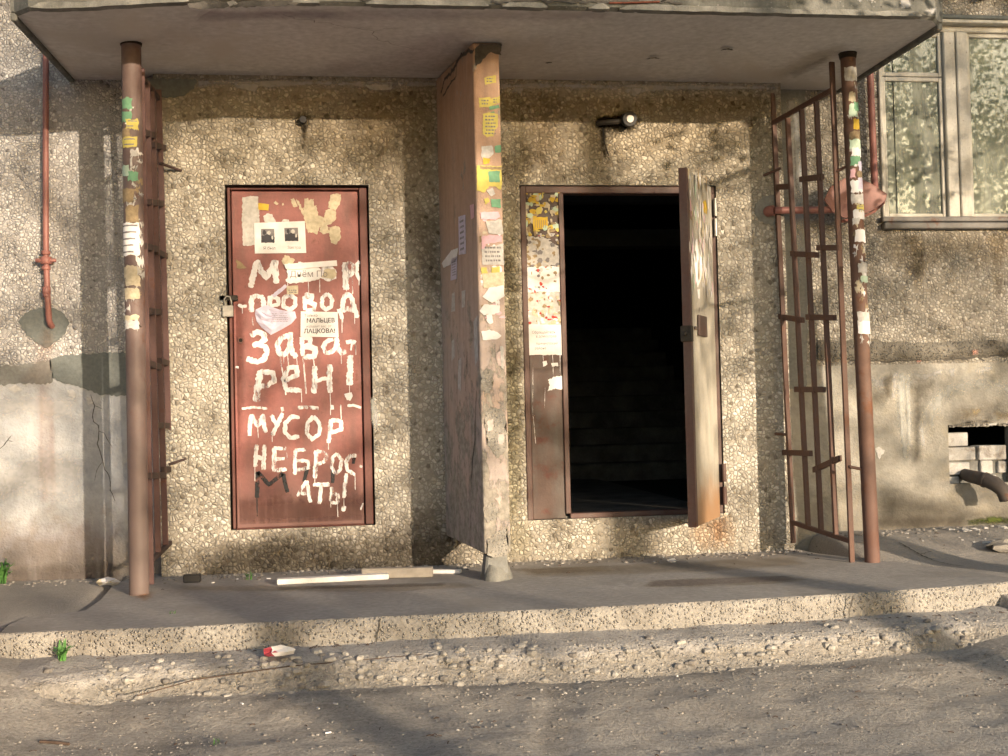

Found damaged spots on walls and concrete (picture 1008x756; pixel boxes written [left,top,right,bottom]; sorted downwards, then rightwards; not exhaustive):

peeling [481,351,505,394]
crack [91,397,115,500]
peeling [484,407,507,459]
leakage [897,370,941,457]
spalling [949,420,1008,428]
spalling [483,497,509,558]